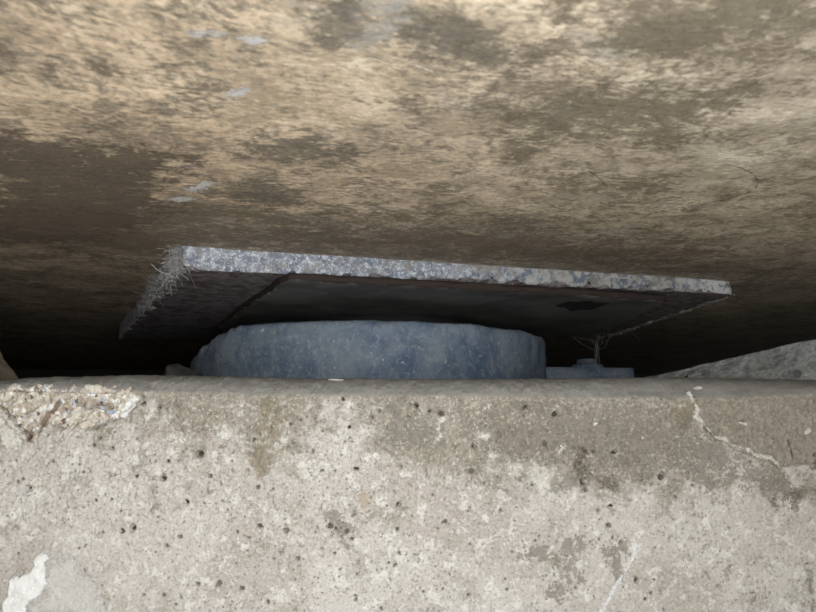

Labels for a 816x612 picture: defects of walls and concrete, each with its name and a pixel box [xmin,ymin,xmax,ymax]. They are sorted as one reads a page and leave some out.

damp [186,30,267,45]
damp [304,0,369,50]
damp [395,8,536,71]
damp [589,0,816,60]
damp [235,129,358,168]
damp [496,79,770,166]
damp [0,128,214,252]
spalling [0,383,145,451]
crack [687,391,793,468]
peeling [2,551,104,612]